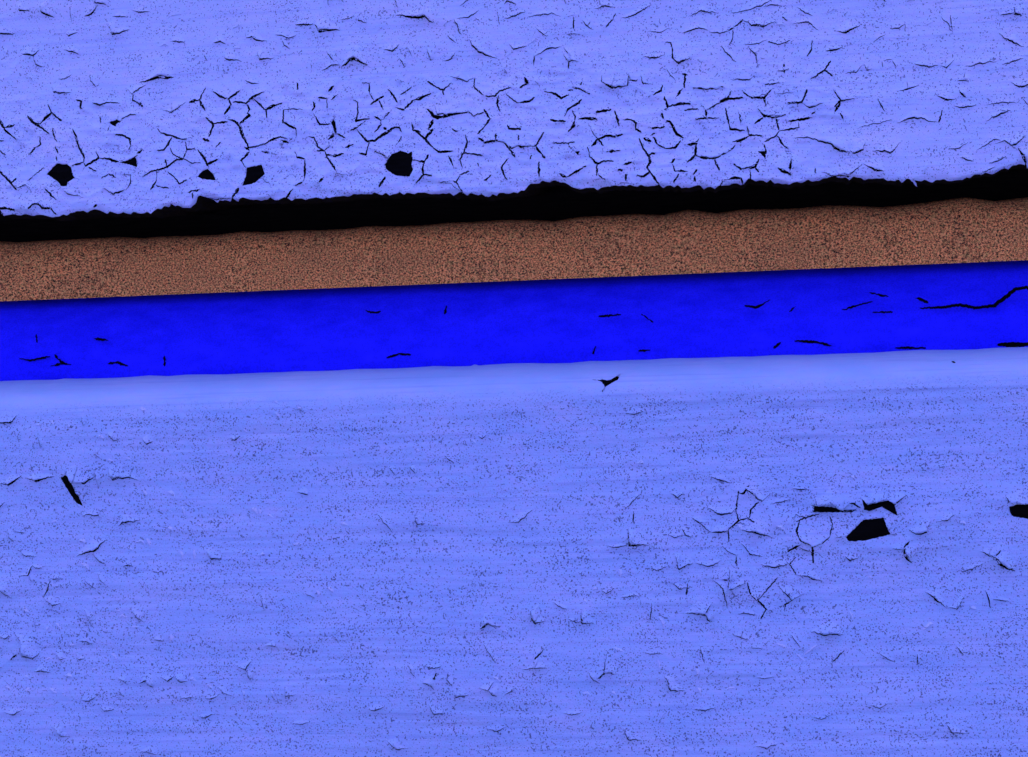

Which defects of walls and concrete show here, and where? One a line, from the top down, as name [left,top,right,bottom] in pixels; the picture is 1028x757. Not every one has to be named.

peeling [246,0,368,60]
peeling [681,0,780,90]
crack [0,17,848,222]
peeling [424,103,470,124]
peeling [42,159,85,198]
peeling [192,160,273,200]
peeling [376,145,418,182]
peeling [0,465,101,520]
peeling [651,505,790,615]
crack [724,486,860,619]
peeling [745,485,955,564]
peeling [1003,490,1028,524]